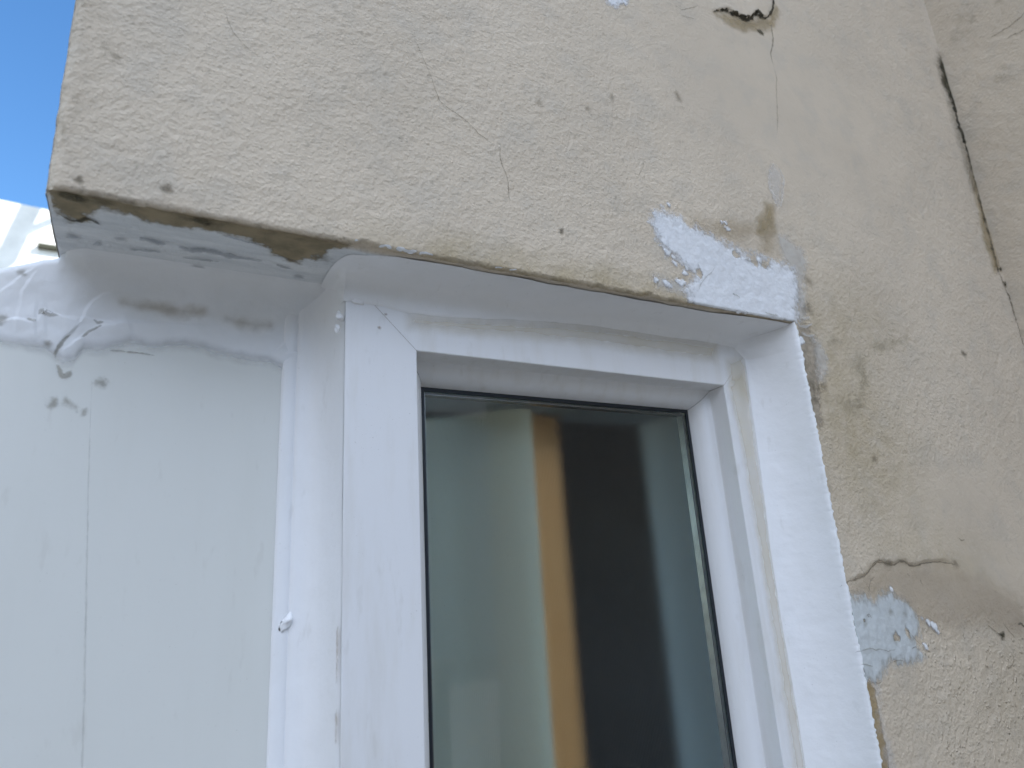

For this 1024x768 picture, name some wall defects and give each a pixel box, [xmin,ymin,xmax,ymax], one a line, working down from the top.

crack [714,0,777,35]
peeling [49,190,358,262]
crack [939,58,1023,342]
peeling [654,248,688,288]